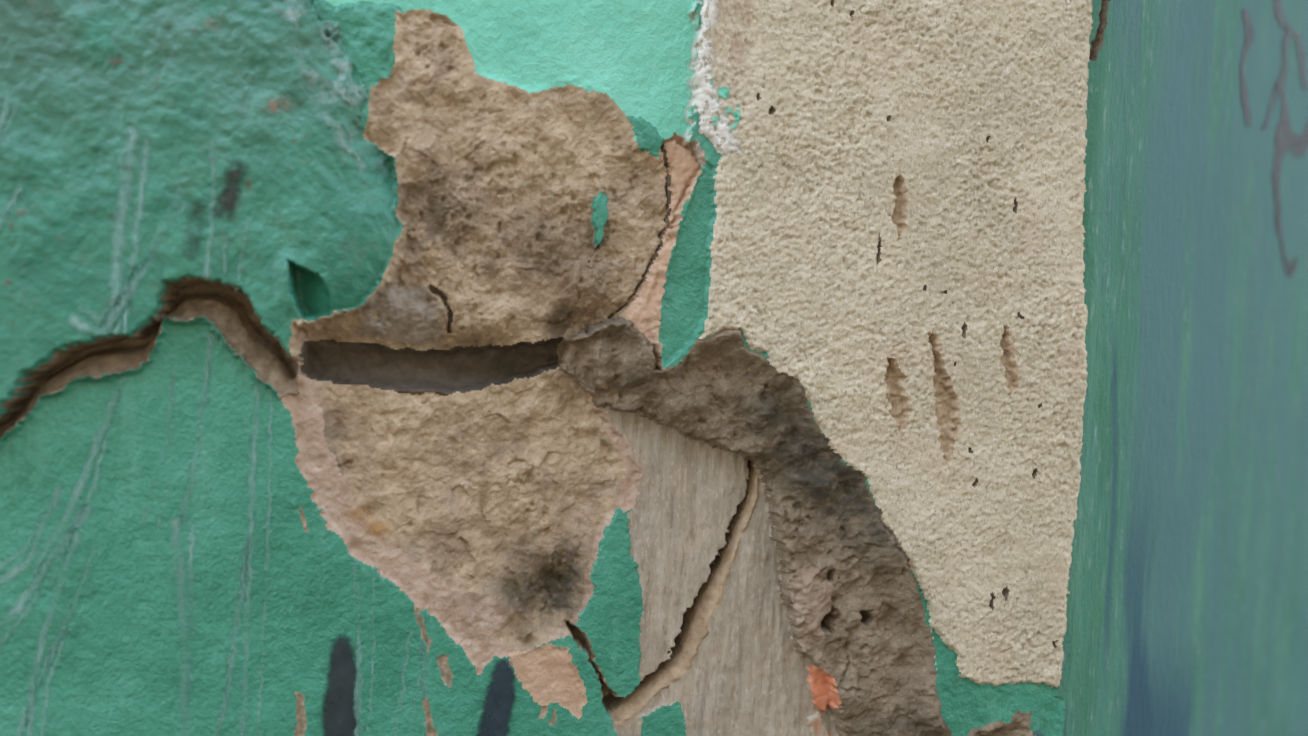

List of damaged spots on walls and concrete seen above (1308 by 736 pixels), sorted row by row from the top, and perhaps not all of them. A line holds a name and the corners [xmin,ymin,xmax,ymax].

crack [0,145,672,438]
flaking render [279,8,1037,736]
crack [564,460,763,727]